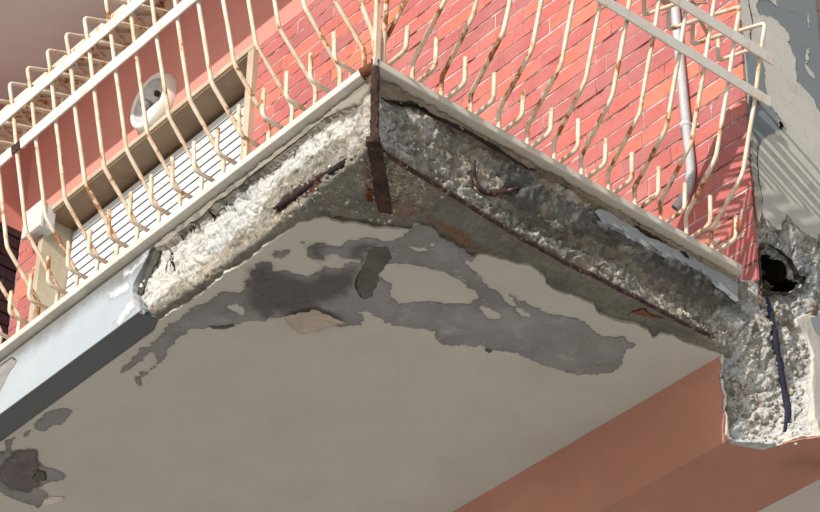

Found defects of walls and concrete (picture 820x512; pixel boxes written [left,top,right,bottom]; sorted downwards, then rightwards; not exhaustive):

peeling [737,0,820,239]
corrosion [275,172,322,213]
spalling [121,92,738,386]
spalling [0,357,17,390]
spalling [728,279,749,309]
spalling [758,242,807,432]
peeling [0,408,73,508]